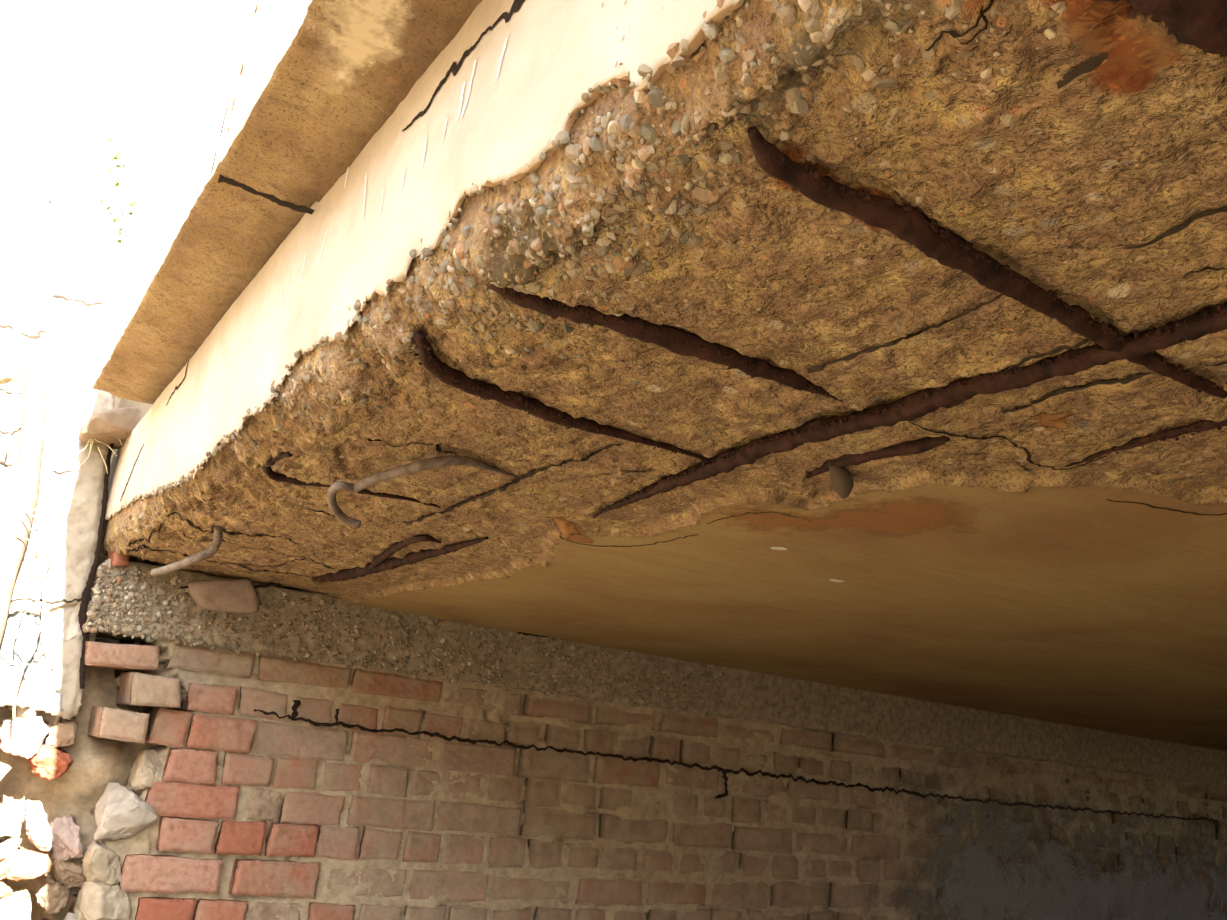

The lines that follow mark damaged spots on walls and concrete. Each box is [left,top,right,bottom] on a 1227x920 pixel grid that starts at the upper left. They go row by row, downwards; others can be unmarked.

crack [210,0,315,215]
damp [326,0,405,82]
crack [402,0,525,132]
corrosion [1047,0,1182,93]
spalling [101,0,1227,605]
spalling [79,407,141,449]
crack [1107,499,1227,516]
crack [253,700,1219,823]